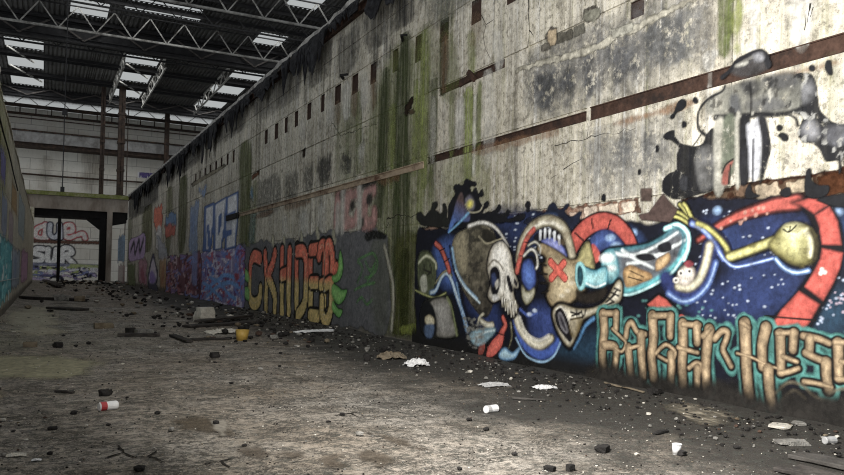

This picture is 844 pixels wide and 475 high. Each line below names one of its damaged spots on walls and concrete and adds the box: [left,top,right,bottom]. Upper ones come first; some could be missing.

damp [378,32,431,336]
flaking render [558,198,641,220]